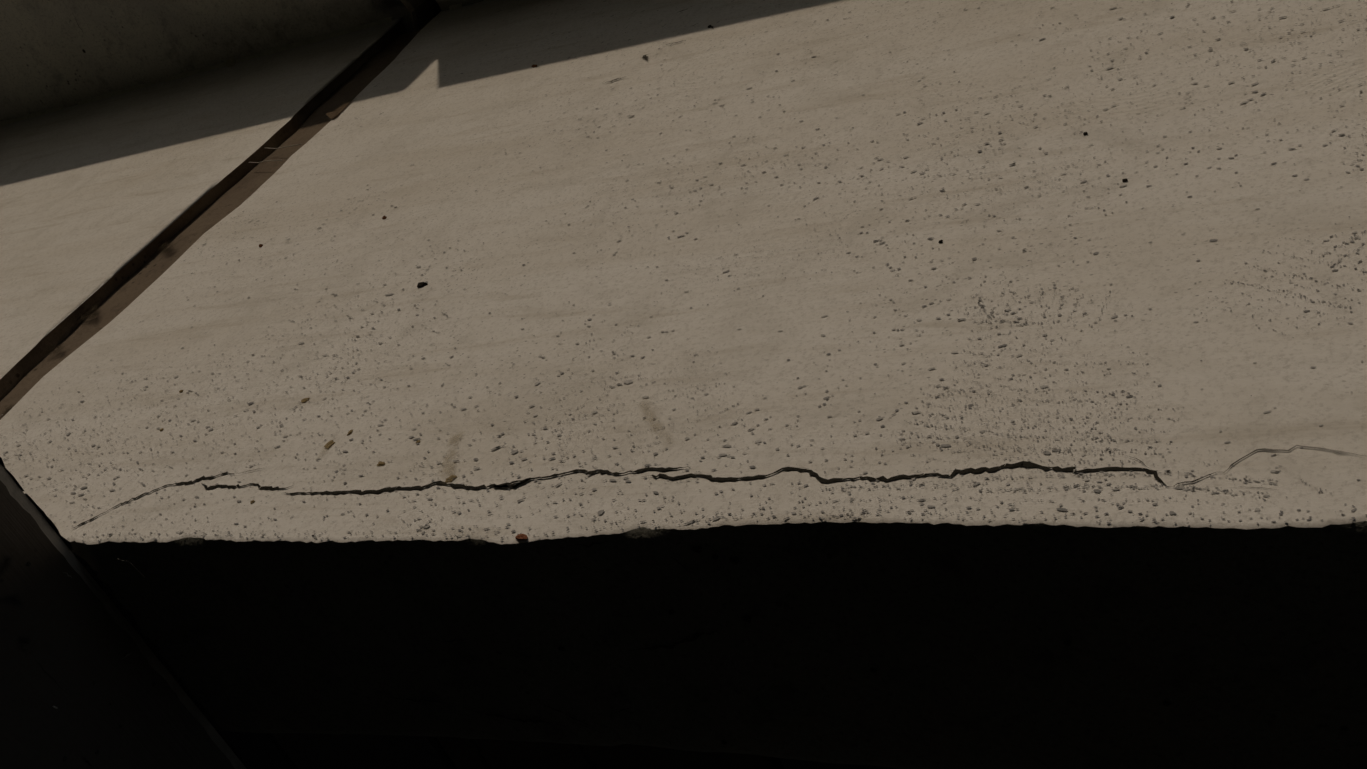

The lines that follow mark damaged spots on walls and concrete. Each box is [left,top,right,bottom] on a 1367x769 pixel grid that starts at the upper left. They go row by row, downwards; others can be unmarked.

crack [71,445,1338,529]